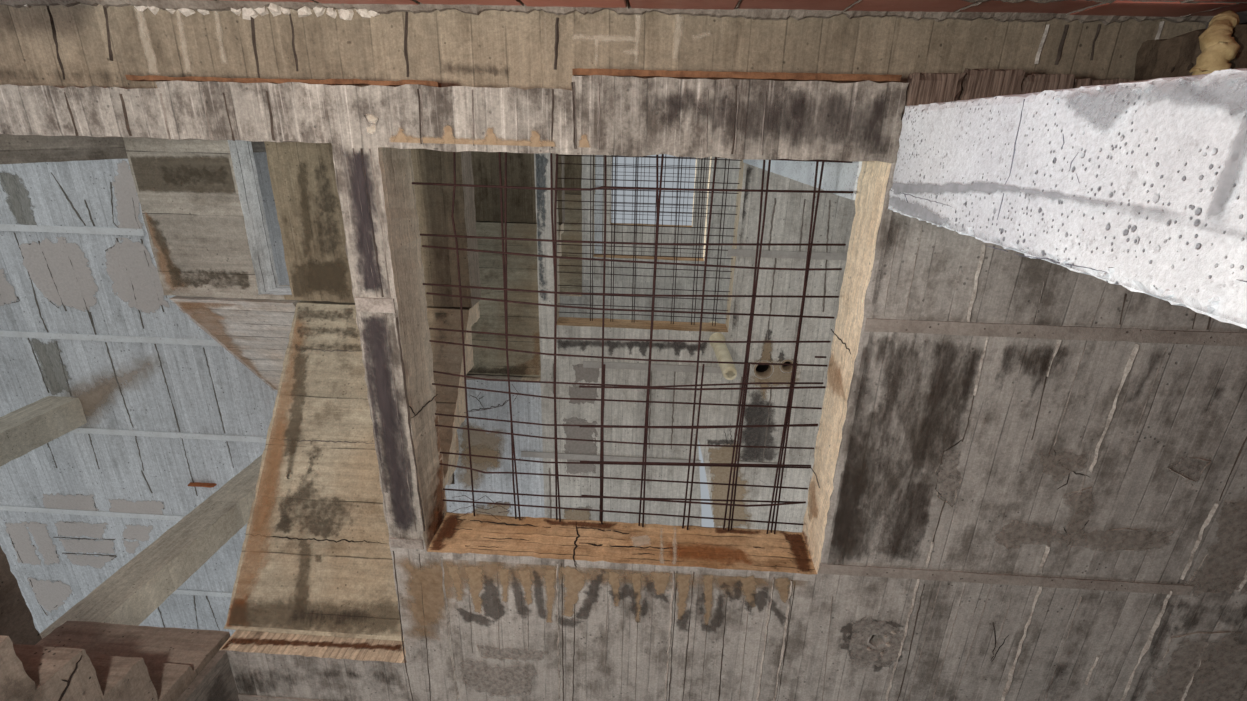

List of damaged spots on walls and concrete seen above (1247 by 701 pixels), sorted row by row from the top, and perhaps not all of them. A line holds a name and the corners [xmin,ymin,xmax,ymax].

leakage [668,93,883,144]
leakage [285,154,414,530]
corrosion [752,360,798,398]
corrosion [183,303,401,651]
leakage [230,447,397,632]
corrosion [401,399,810,636]
crack [455,518,794,567]
leakage [829,339,975,563]
spalling [1186,501,1247,597]
crack [58,655,82,701]
spalling [840,618,906,672]
spalling [1146,631,1247,701]